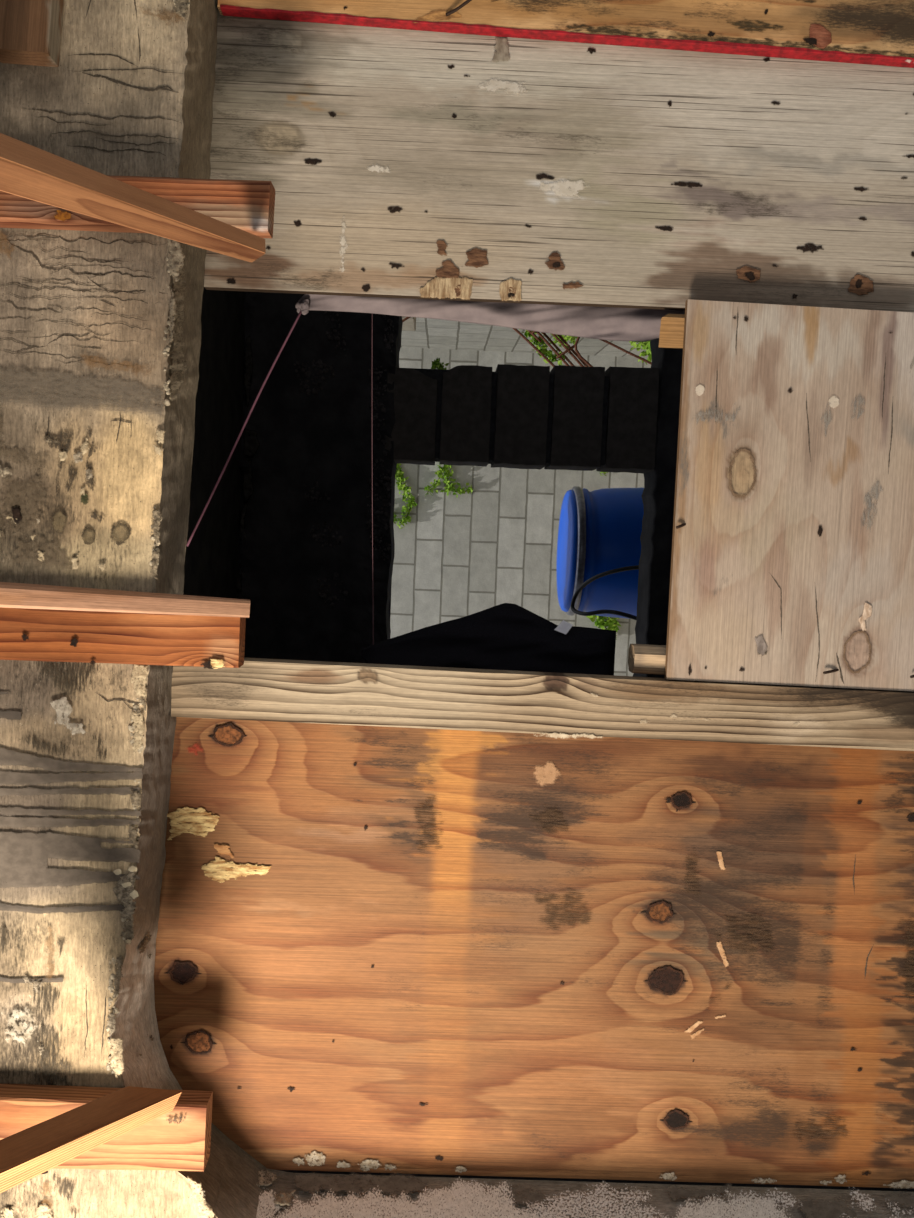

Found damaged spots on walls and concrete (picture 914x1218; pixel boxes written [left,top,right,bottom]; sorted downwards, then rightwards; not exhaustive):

damp [566,19,914,58]
crack [24,0,181,156]
crack [0,235,163,366]
damp [34,661,100,694]
damp [0,734,143,888]
damp [0,903,135,955]
damp [535,887,590,930]
damp [0,977,75,1086]
damp [294,1172,428,1197]
damp [502,1185,556,1217]